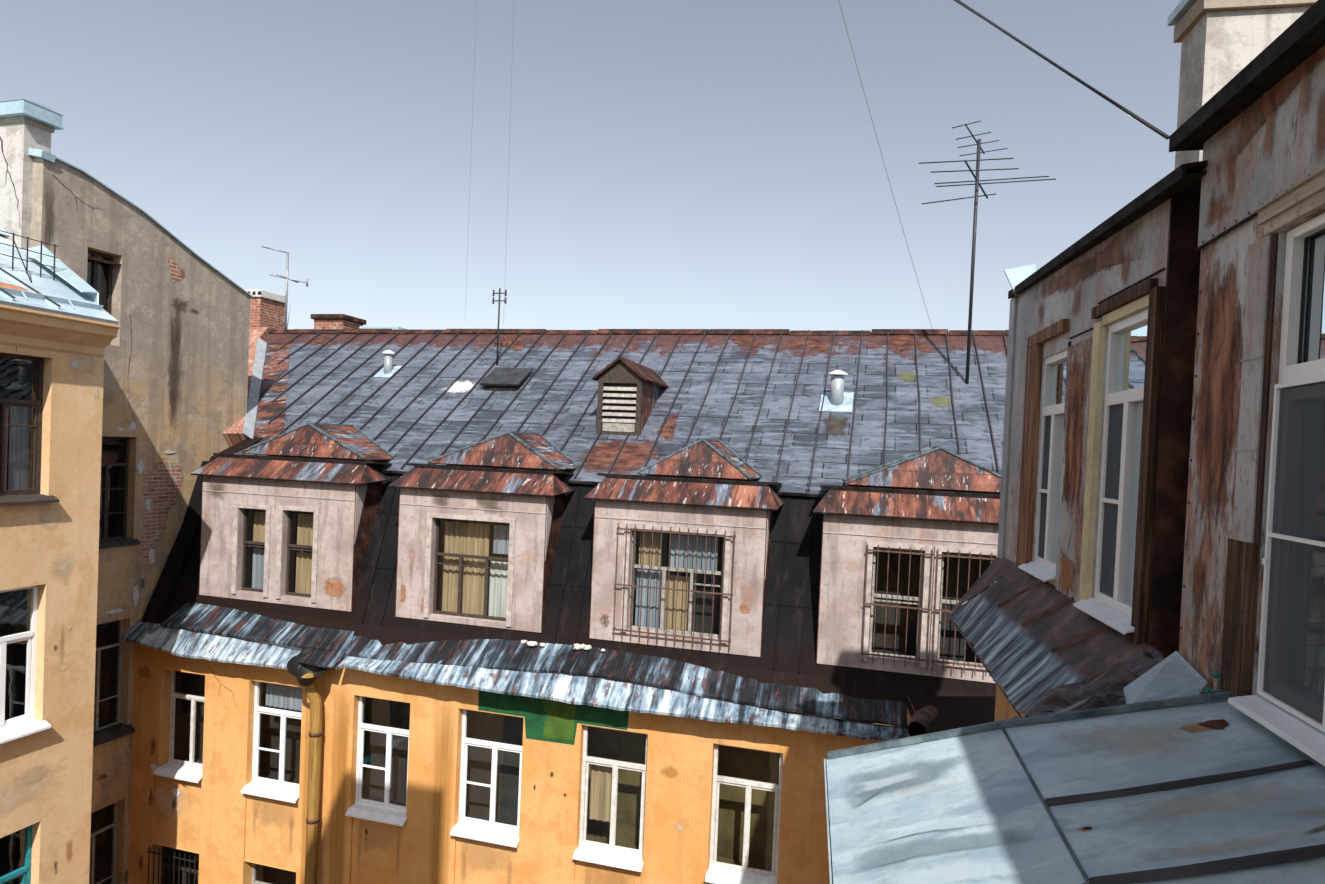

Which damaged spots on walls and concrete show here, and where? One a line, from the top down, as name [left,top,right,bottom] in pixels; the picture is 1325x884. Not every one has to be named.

corrosion [1208,45,1325,224]
crack [0,137,20,225]
corrosion [577,414,678,474]
corrosion [1061,363,1085,505]
flaking render [104,450,184,615]
corrosion [1060,550,1074,591]
corrosion [1183,719,1229,732]